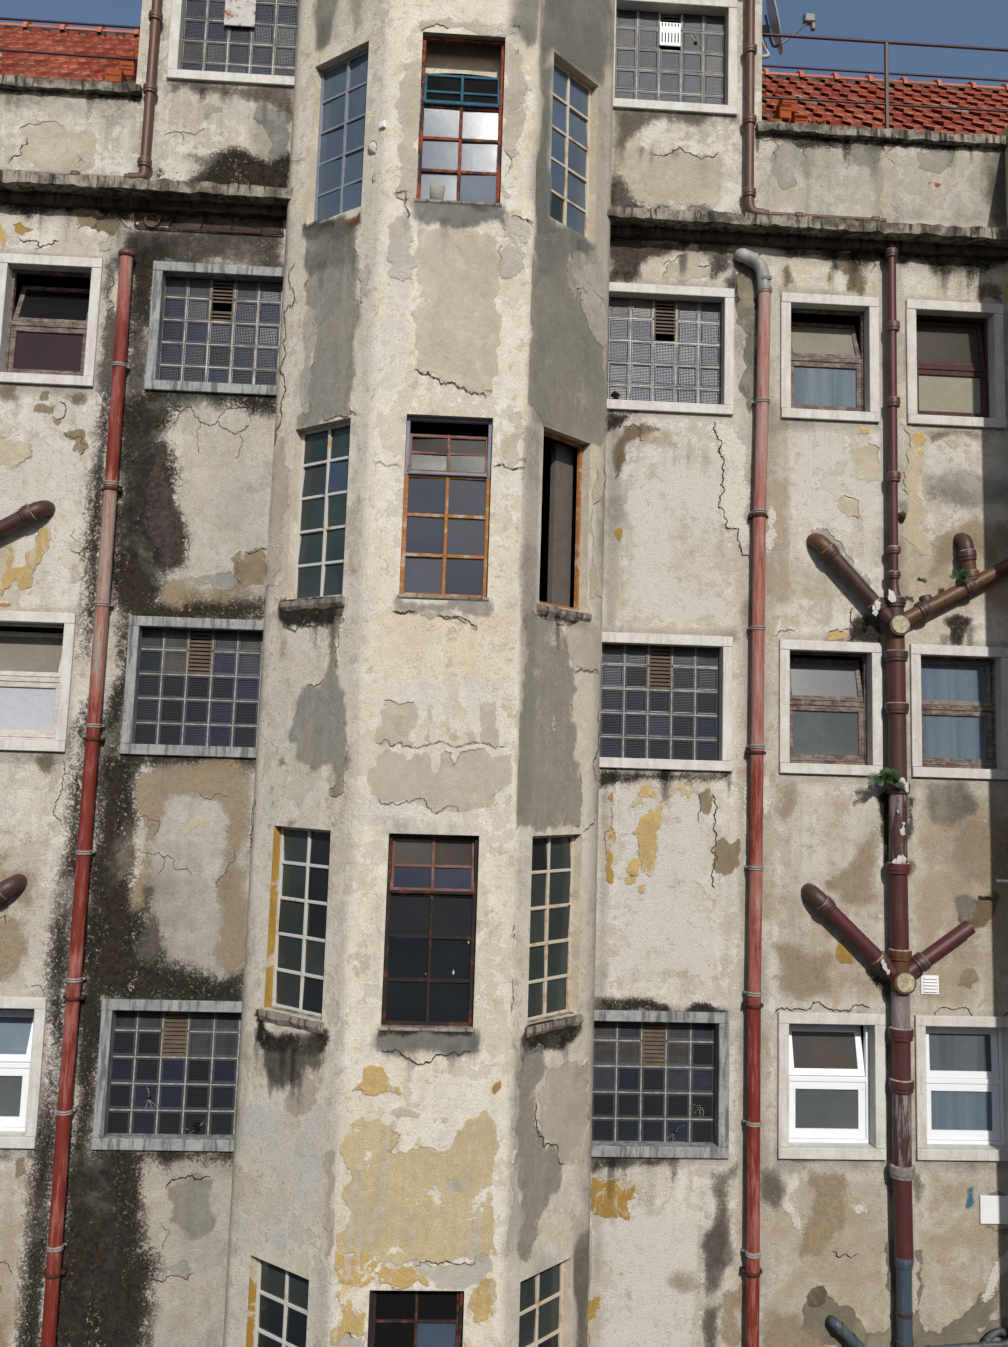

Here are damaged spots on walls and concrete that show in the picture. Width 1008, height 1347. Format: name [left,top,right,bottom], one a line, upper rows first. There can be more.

water stain [155,146,290,188]
water stain [303,212,361,274]
crack [713,422,750,560]
peeling [289,613,349,797]
peeling [375,698,433,744]
water stain [0,204,344,1347]
peeling [604,784,713,894]
peeling [712,837,741,875]
water stain [376,1027,479,1055]
peeling [317,1039,590,1347]
peeling [590,1173,645,1221]
peeling [578,1297,601,1347]